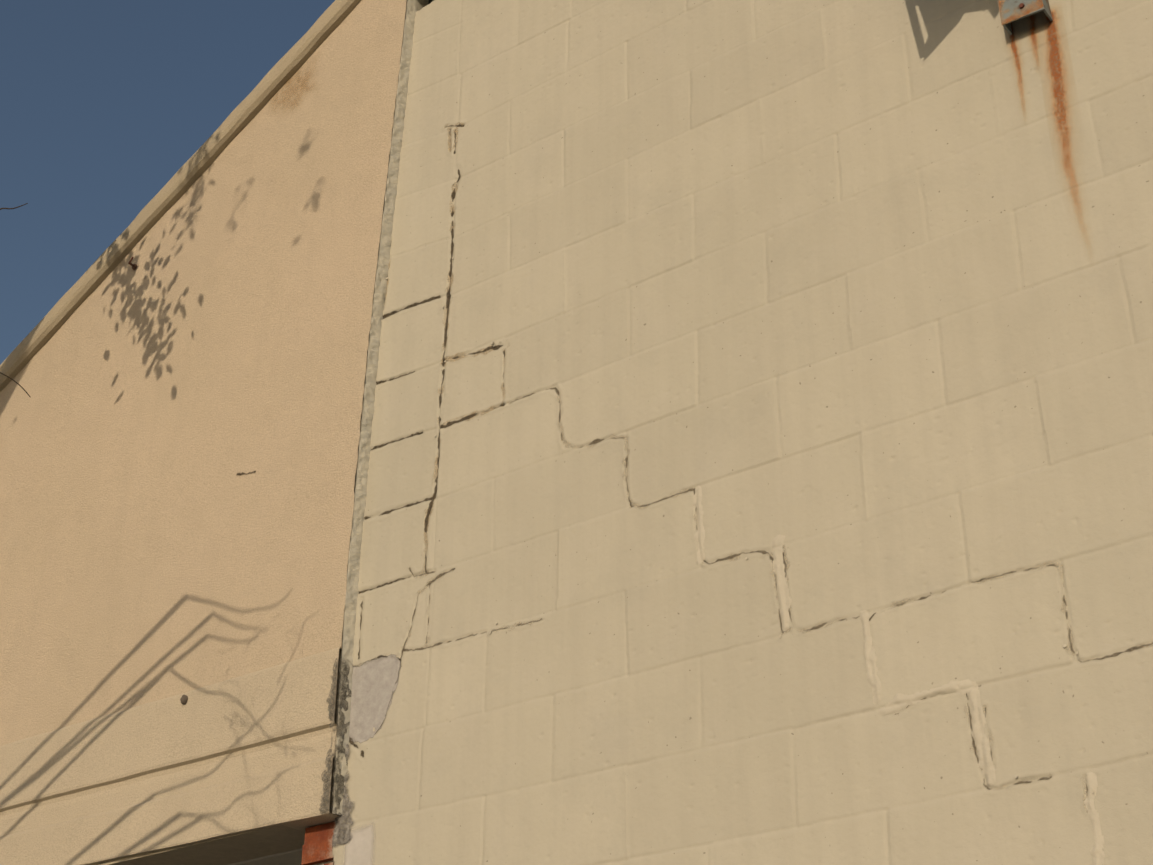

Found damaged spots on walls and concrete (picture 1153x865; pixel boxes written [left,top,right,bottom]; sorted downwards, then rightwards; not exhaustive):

corrosion [999,0,1071,168]
crack [349,123,695,757]
crack [704,546,786,577]
crack [779,597,927,638]
crack [1063,599,1151,662]
peeling [319,654,401,846]
crack [966,694,1051,789]